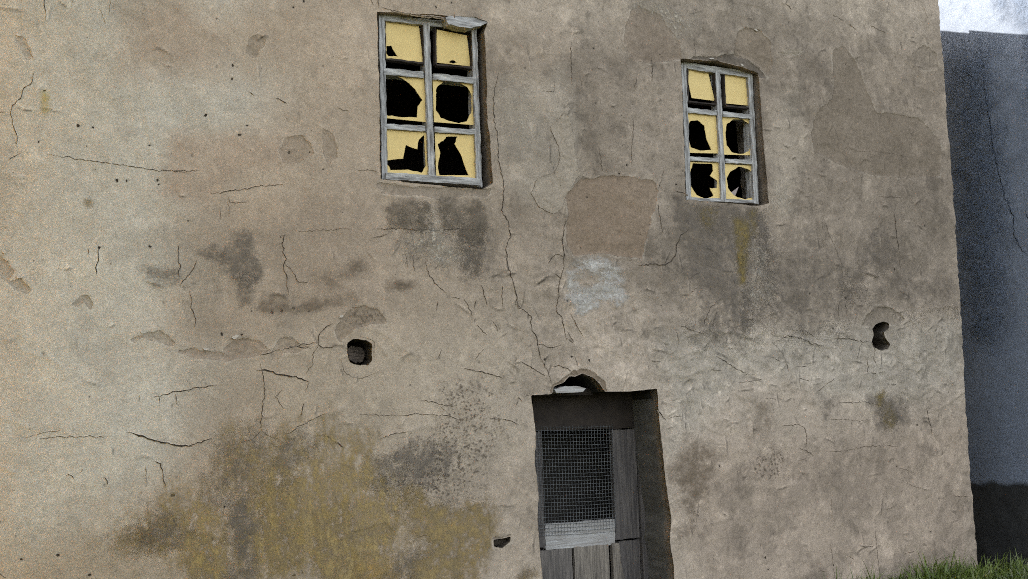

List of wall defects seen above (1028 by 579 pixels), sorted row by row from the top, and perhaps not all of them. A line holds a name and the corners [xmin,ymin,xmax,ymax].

leakage [997,0,1028,47]
crack [0,44,35,160]
crack [49,154,200,173]
leakage [198,230,262,303]
leakage [387,199,490,275]
crack [372,73,583,425]
peeling [565,175,659,259]
peeling [131,330,309,362]
crack [240,323,377,448]
crack [23,429,212,488]
leakage [375,383,501,514]
leakage [315,500,358,579]